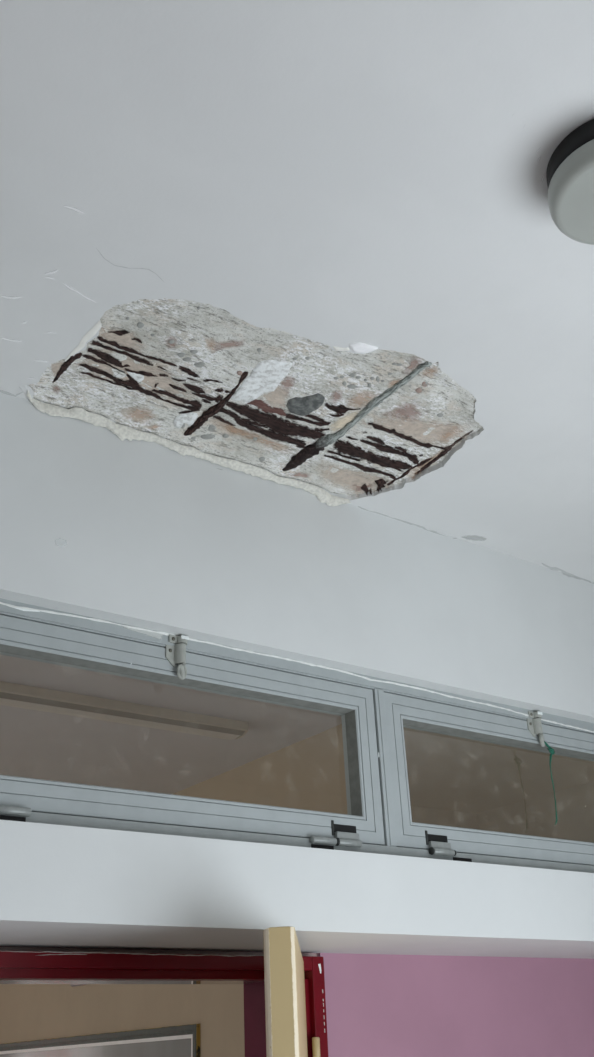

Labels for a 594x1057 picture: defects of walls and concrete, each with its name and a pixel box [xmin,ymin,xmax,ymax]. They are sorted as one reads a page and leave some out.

spalling [19,298,483,506]
corrosion [79,327,461,496]